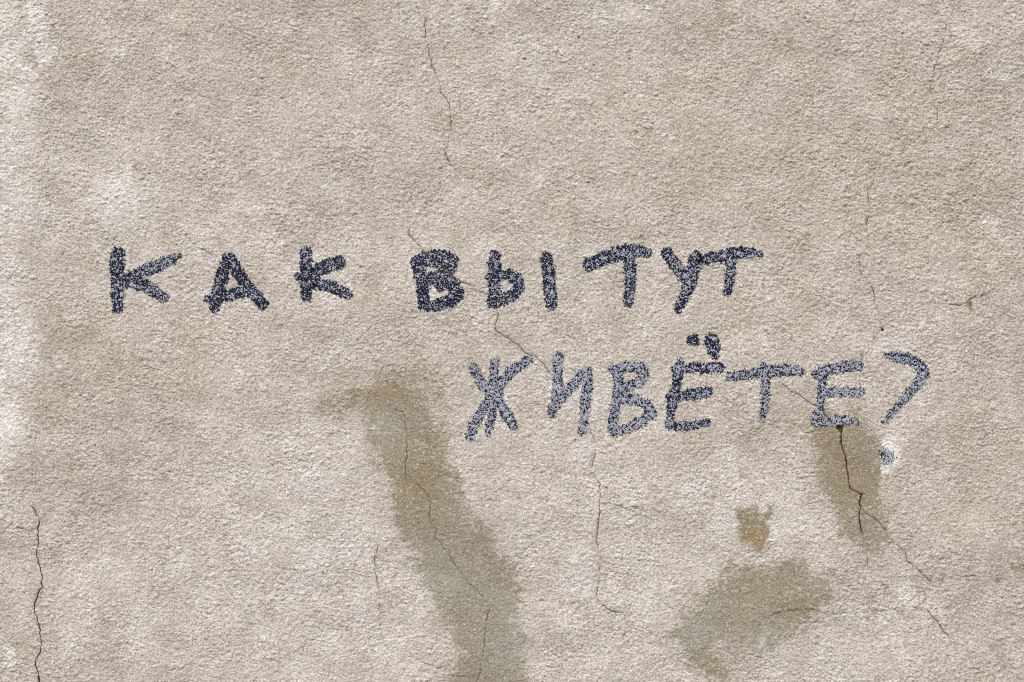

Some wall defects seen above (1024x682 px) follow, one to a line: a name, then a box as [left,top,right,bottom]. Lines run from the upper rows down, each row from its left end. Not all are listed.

crack [424,19,518,182]
crack [20,505,43,682]
water stain [294,349,548,682]
crack [391,408,505,681]
water stain [653,382,920,682]
crack [750,340,1003,638]